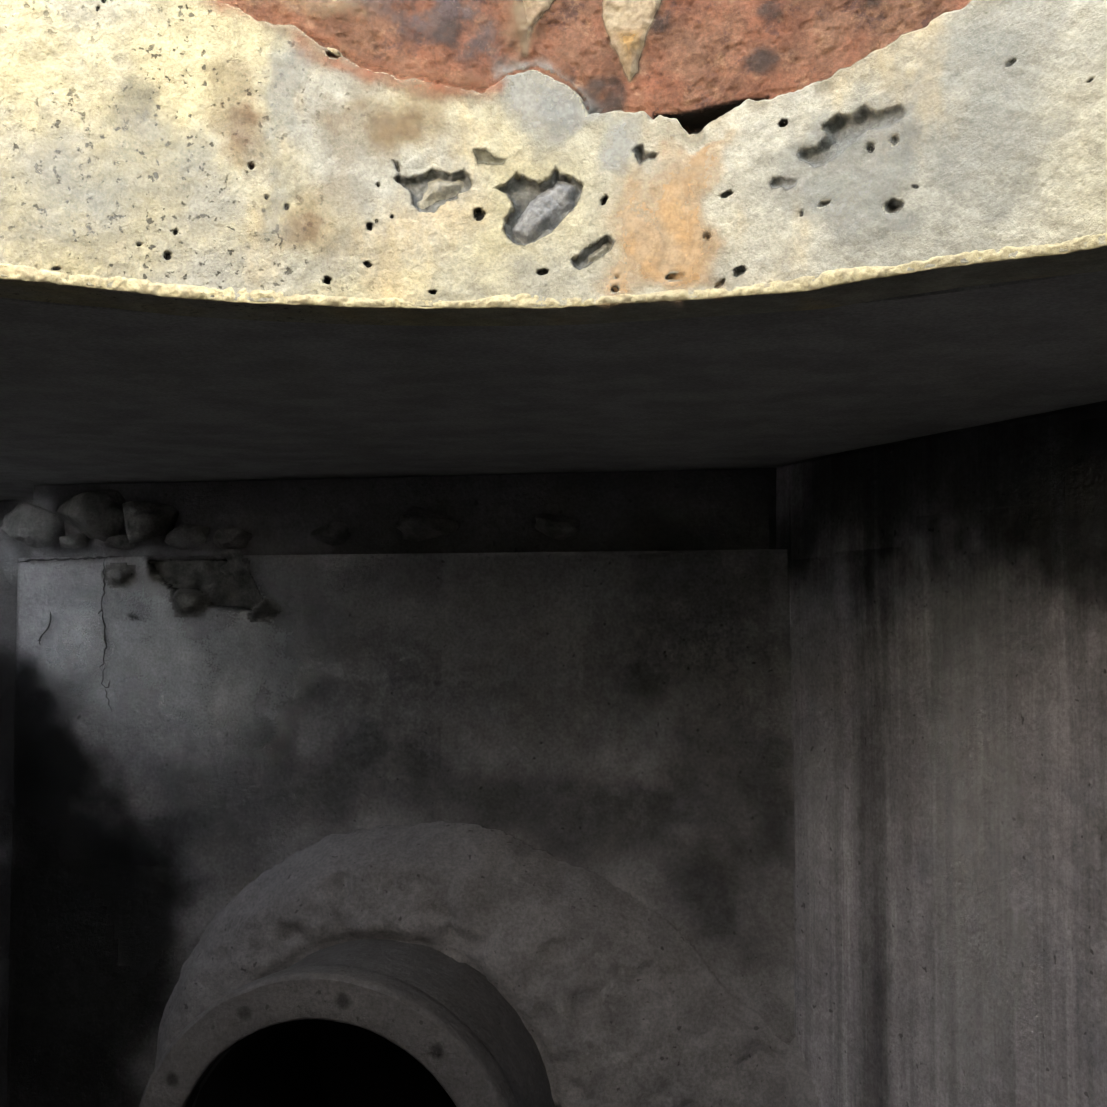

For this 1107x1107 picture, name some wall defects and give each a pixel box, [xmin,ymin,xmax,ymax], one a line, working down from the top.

hole [395,163,472,213]
hole [473,149,506,165]
hole [499,167,583,246]
hole [770,177,797,190]
hole [797,106,906,168]
crack [20,556,133,711]